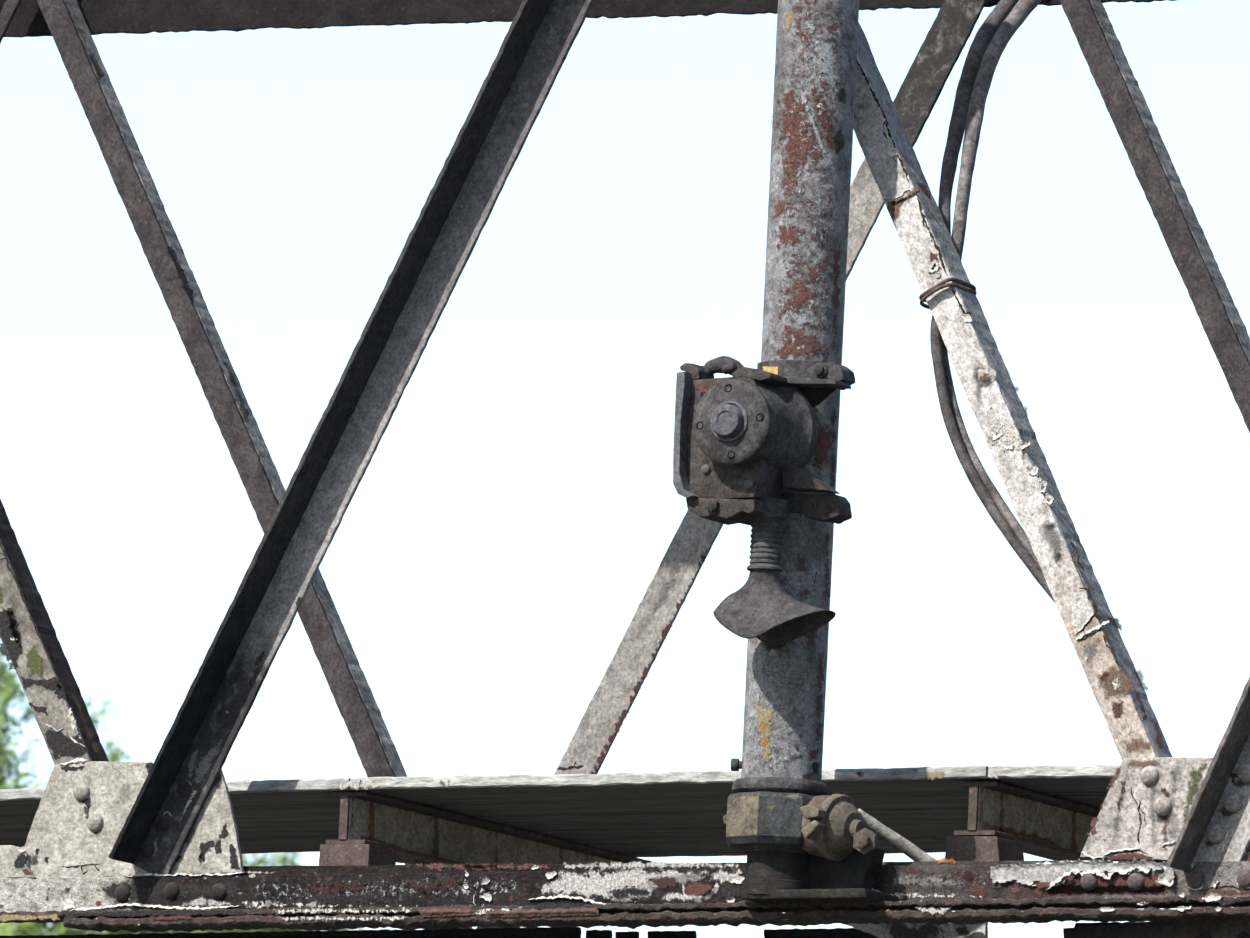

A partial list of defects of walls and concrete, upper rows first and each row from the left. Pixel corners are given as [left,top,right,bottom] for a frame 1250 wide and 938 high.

rust [771,0,846,359]
rust [783,532,832,599]
crack [1070,536,1106,636]
peeling [45,708,85,765]
rust [750,634,825,779]
crack [1131,789,1146,843]
peeling [60,861,745,921]
rust [937,858,1022,896]
peeling [872,848,1250,915]